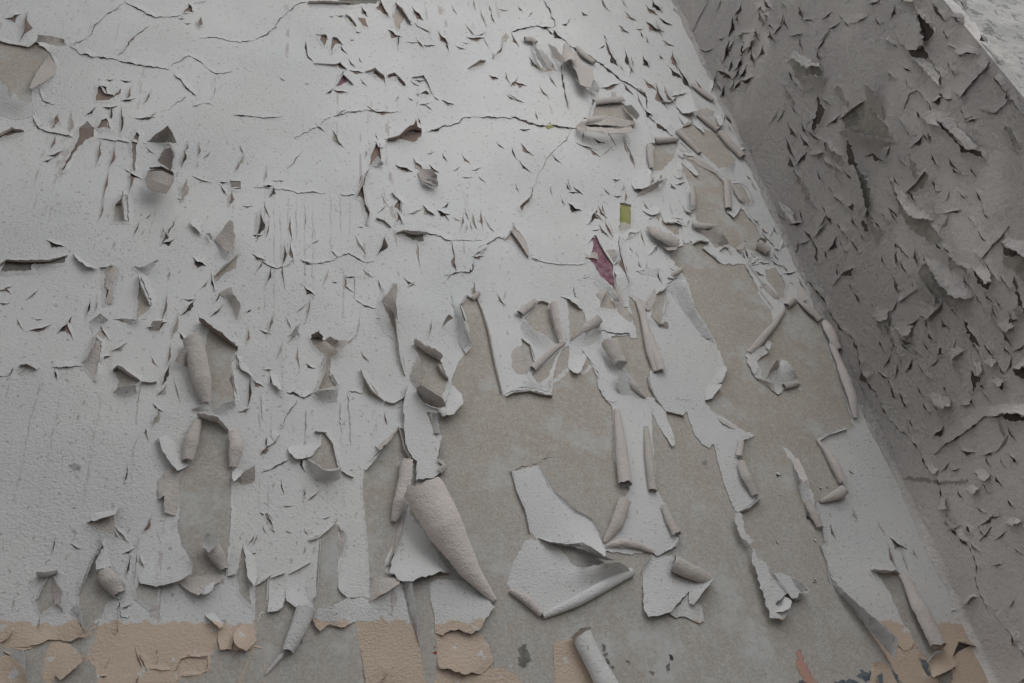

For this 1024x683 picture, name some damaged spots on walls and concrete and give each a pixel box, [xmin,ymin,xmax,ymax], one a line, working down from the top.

peeling [0,10,306,290]
crack [69,0,399,197]
crack [425,109,577,171]
crack [509,0,677,136]
peeling [782,21,897,265]
peeling [109,292,197,397]
crack [159,215,178,246]
crack [257,249,376,308]
peeling [287,285,361,403]
crack [444,229,508,280]
peeling [871,154,1024,409]
peeling [0,506,132,683]